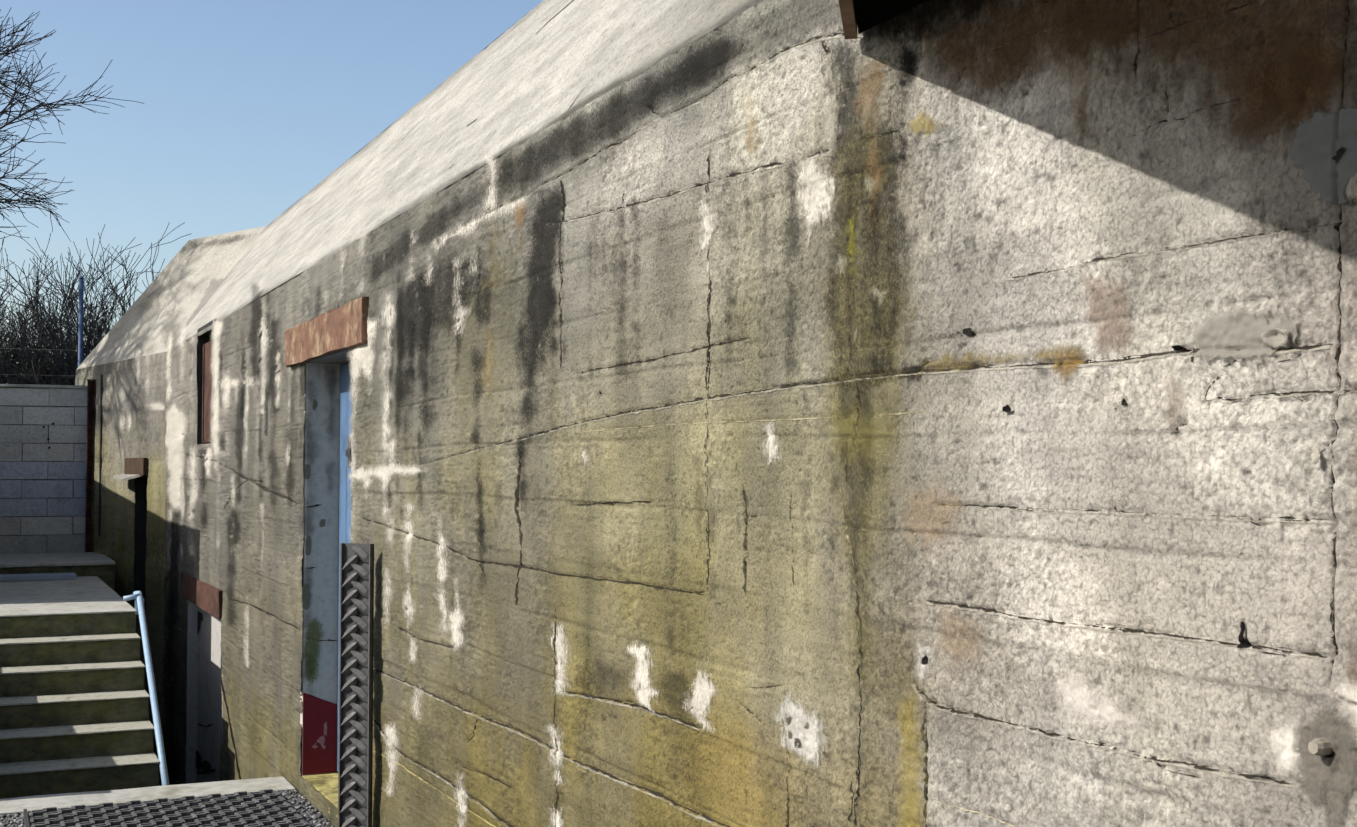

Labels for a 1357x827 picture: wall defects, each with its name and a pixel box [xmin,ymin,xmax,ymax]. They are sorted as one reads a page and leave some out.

corrosion [869,0,992,42]
crack [1133,23,1185,76]
crack [1341,0,1350,109]
damp [348,38,743,568]
damp [796,41,929,473]
crack [362,32,1357,827]
efflorescence [437,525,465,649]
efflorescence [551,624,568,694]
efflorescence [628,644,657,711]
efflorescence [684,672,714,728]
damp [457,782,468,827]
damp [1272,688,1357,827]